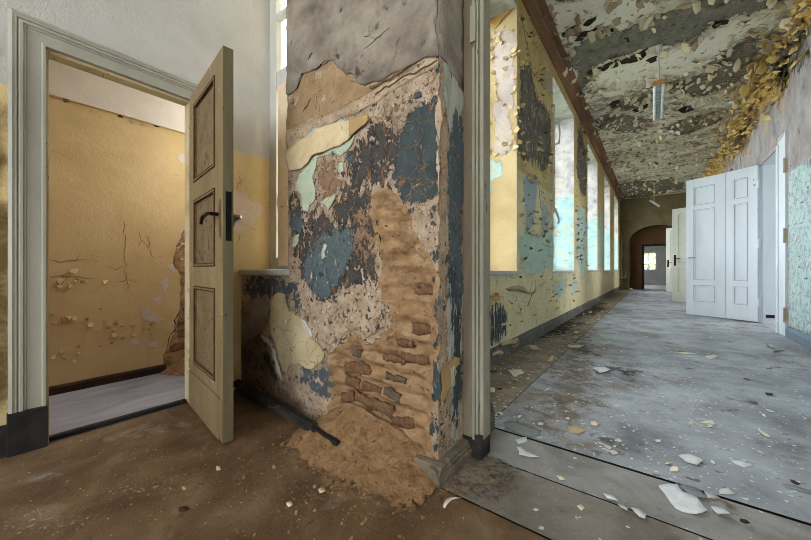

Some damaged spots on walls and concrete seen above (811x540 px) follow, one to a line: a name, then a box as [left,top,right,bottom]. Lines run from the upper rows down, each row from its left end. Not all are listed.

crack [49,223,161,286]
spalling [50,227,185,366]
peeling [233,177,266,239]
spalling [285,60,374,247]
spalling [261,188,460,461]
peeling [490,9,580,356]
peeling [541,0,811,266]